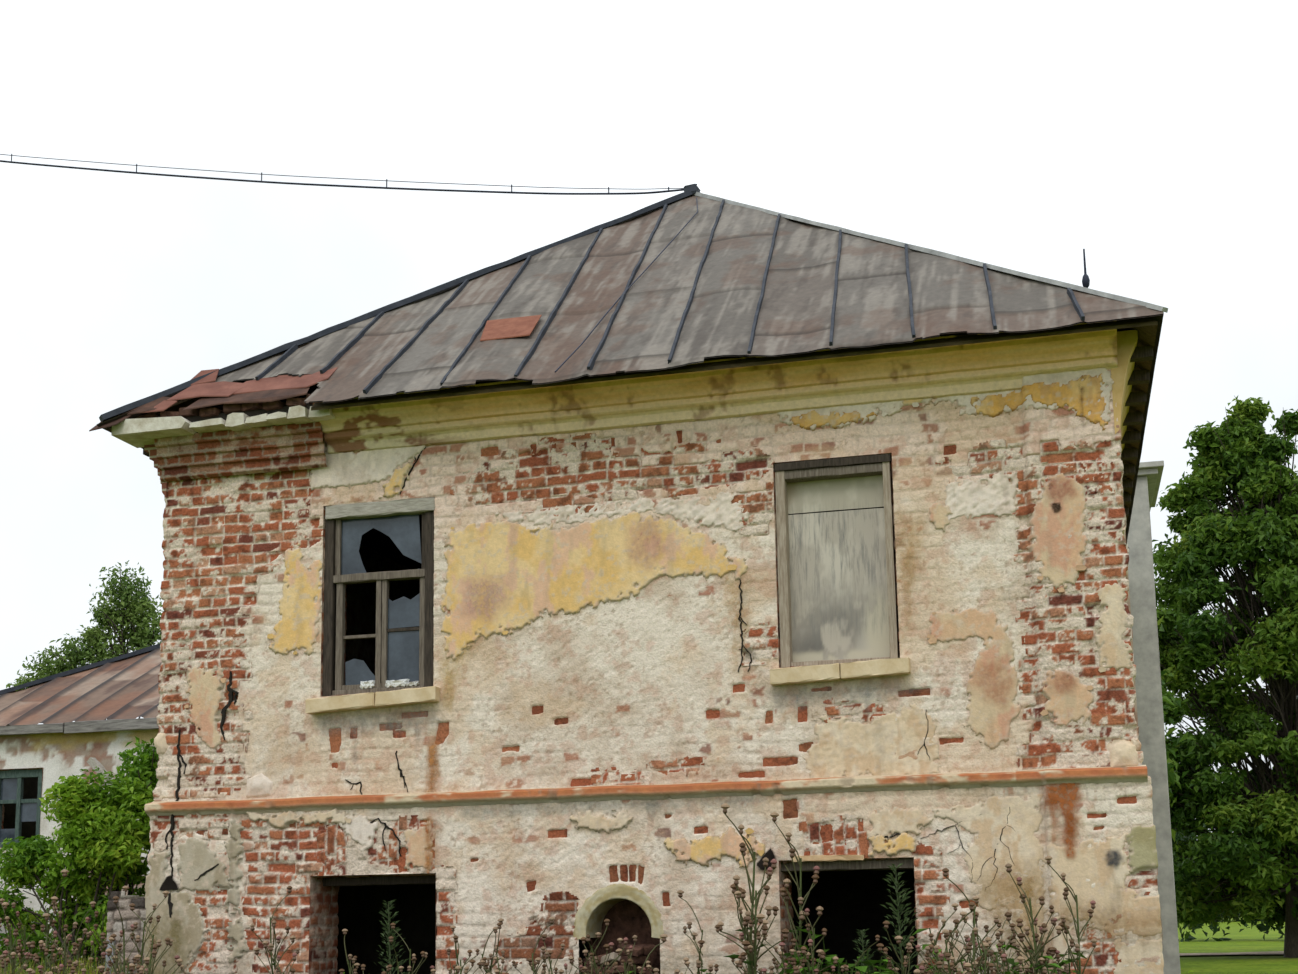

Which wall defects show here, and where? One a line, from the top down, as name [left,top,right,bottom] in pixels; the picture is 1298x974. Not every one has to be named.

spalling [143,446,459,974]
peeling [440,430,775,661]
spalling [738,368,1144,778]
peeling [782,793,1164,974]